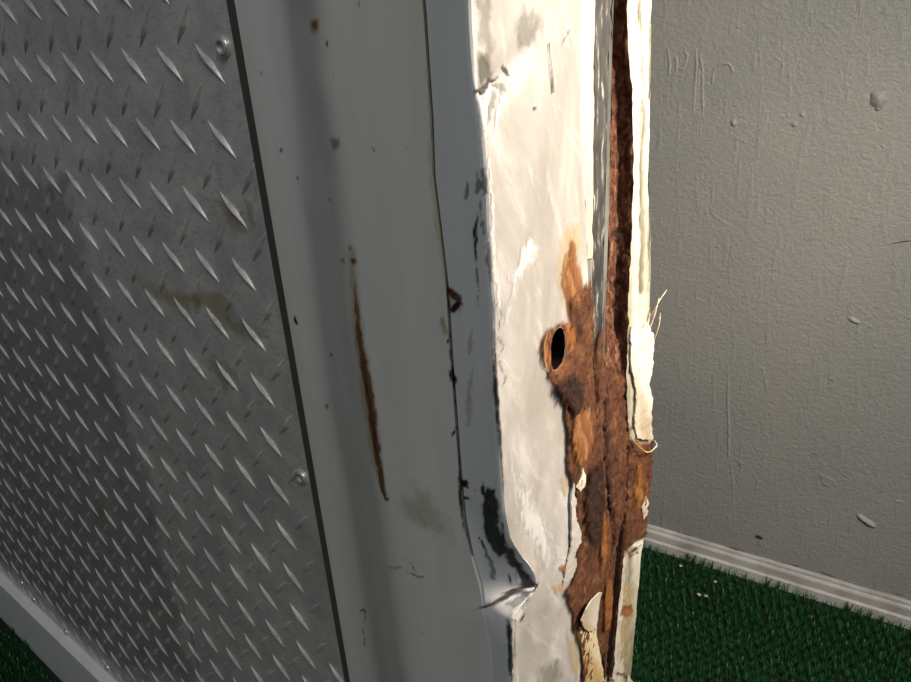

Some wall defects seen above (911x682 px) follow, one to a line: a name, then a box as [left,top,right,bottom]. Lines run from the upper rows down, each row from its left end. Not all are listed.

peeling [487,156,537,322]
corrosion [355,302,388,501]
peeling [513,453,586,586]
corrosion [543,241,654,682]
peeling [629,290,667,453]
peeling [579,592,614,682]